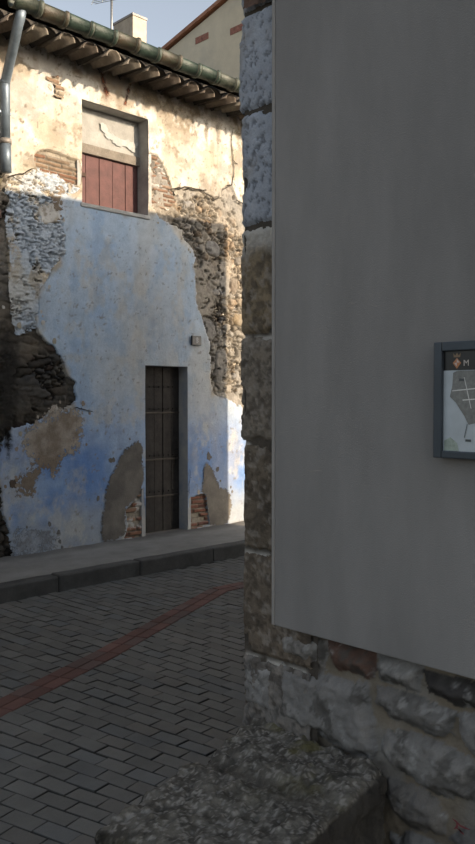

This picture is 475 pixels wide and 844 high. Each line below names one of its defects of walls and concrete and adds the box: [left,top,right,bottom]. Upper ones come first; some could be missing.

flaking render [151,145,178,213]
peeling [2,149,80,335]
peeling [4,401,91,498]
flaking render [191,490,209,529]